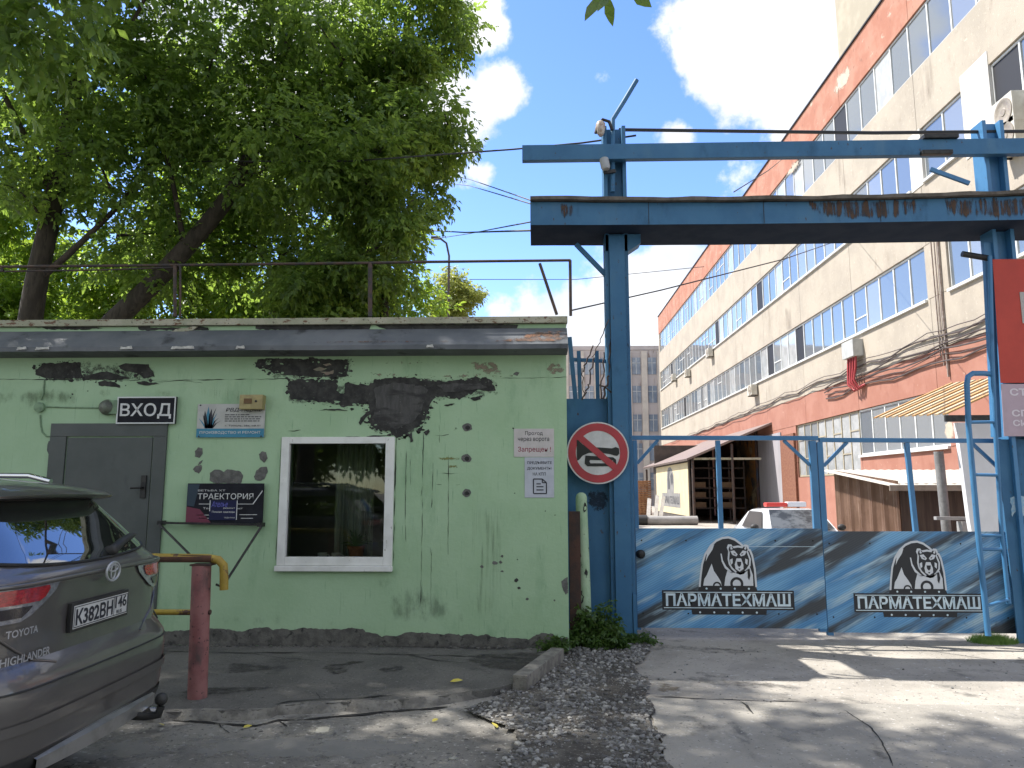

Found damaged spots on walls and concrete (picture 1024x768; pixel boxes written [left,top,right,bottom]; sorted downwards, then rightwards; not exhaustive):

corrosion [809,199,916,219]
corrosion [946,198,1024,217]
peeling [32,360,158,398]
peeling [253,357,519,562]